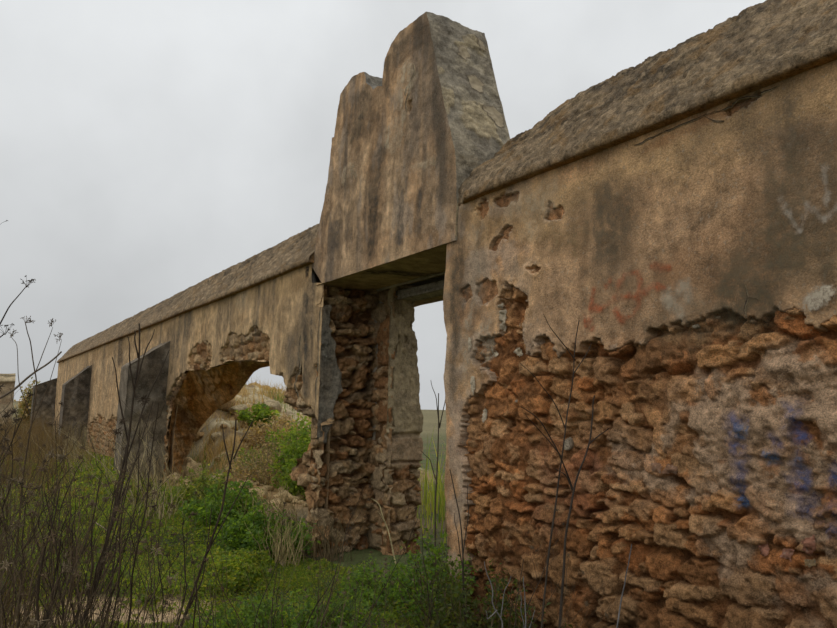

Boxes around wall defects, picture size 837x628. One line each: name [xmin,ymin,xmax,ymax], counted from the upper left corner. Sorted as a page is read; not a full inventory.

crack [634,85,780,146]
spalling [161,326,270,483]
spalling [462,286,837,628]